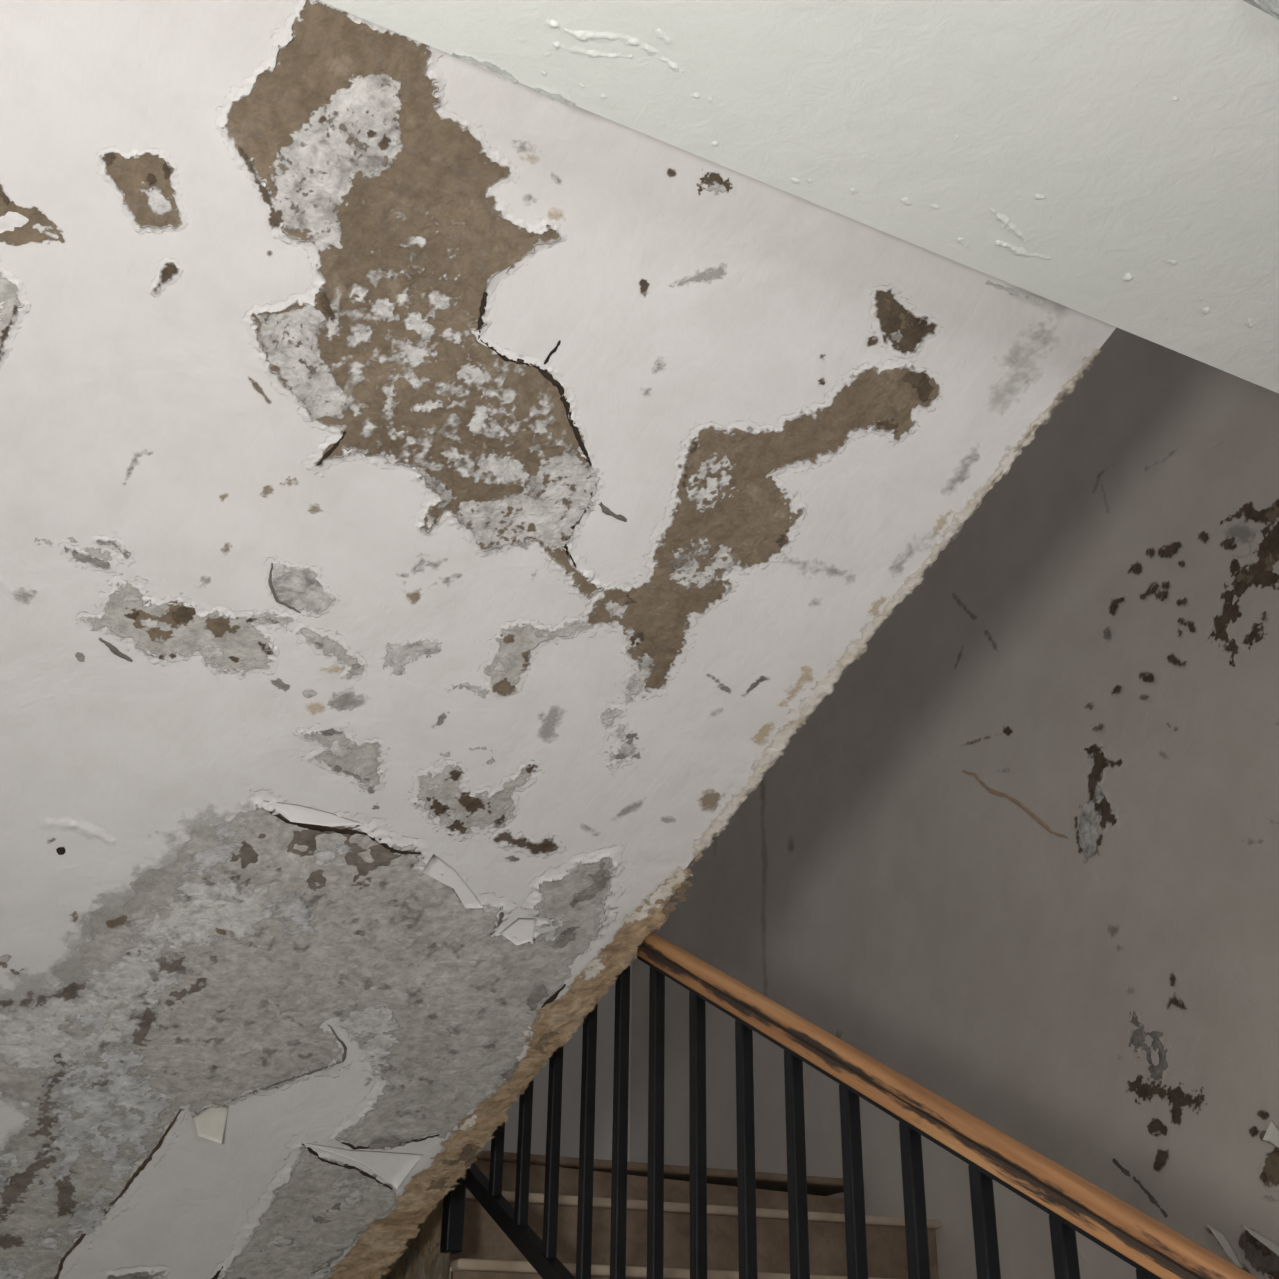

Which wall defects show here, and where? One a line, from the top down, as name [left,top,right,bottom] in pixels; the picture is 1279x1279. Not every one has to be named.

peeling [95,146,188,235]
peeling [0,185,65,371]
peeling [214,0,945,775]
peeling [1104,597,1124,639]
peeling [1128,542,1185,574]
peeling [1140,499,1279,674]
peeling [1075,724,1129,863]
spalling [0,531,702,1279]
peeling [1168,974,1187,1009]
peeling [1125,1005,1207,1171]
peeling [1249,1111,1279,1192]
peeling [1207,1219,1279,1279]